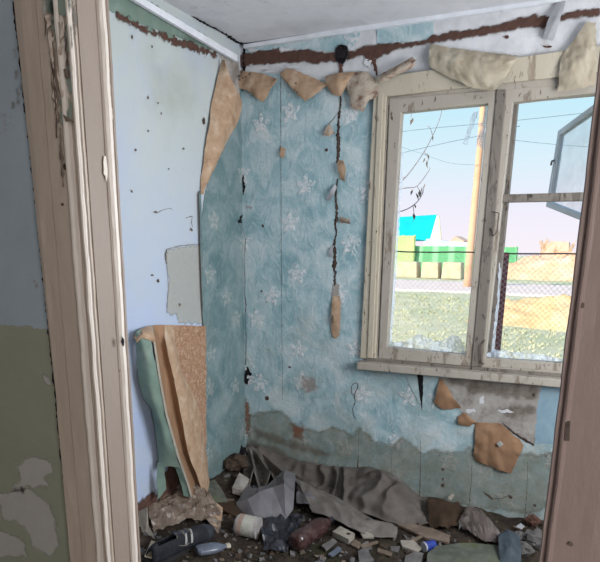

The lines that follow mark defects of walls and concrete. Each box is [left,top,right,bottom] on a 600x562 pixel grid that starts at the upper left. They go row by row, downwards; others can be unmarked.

peeling [42,0,77,187]
flaking render [116,11,336,95]
crack [329,96,342,163]
flaking render [347,14,549,76]
flaking render [560,8,600,21]
crack [331,179,339,286]
peeling [165,243,204,324]
flaking render [439,377,541,444]
peeling [0,457,58,558]